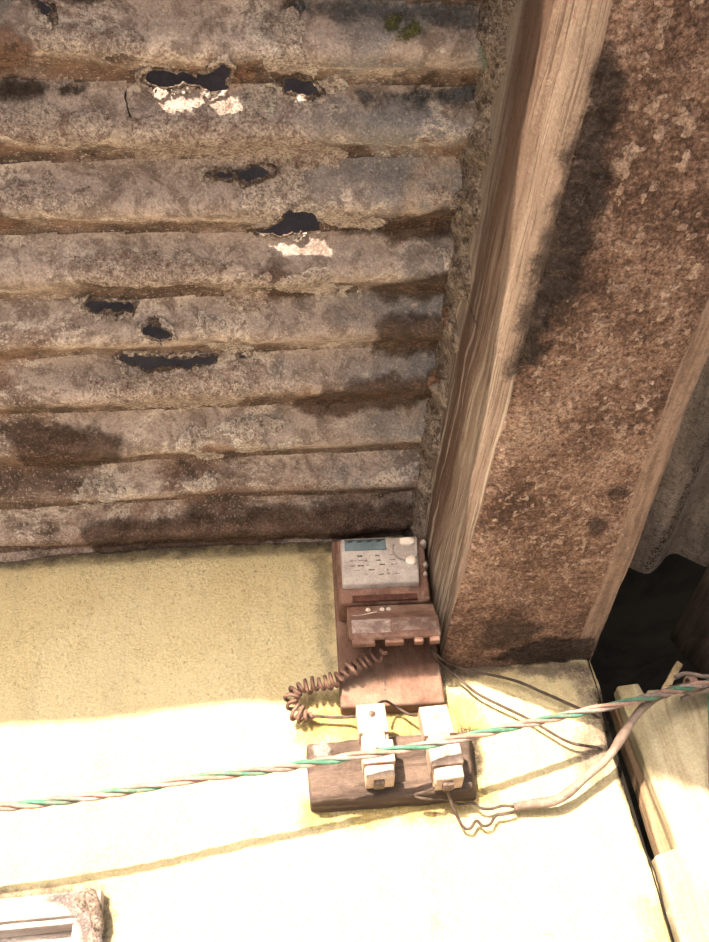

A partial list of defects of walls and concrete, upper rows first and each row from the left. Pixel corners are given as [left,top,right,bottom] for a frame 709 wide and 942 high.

corrosion [231,64,259,89]
water stain [503,46,626,380]
water stain [298,696,491,828]
water stain [440,614,641,839]